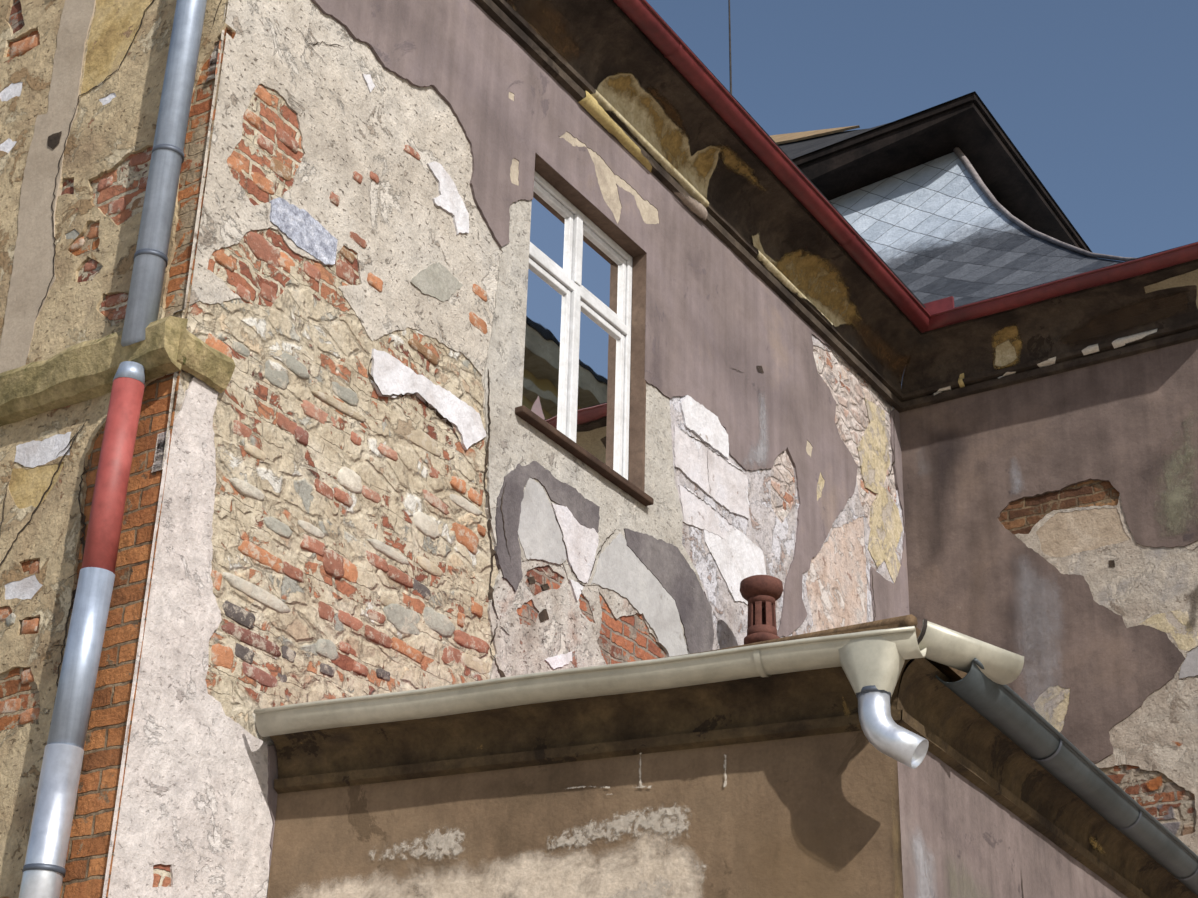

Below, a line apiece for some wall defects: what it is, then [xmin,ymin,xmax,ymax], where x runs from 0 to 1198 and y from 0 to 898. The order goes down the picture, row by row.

crack [36,0,154,317]
peeling [993,326,1022,378]
peeling [1082,329,1157,355]
flaking render [9,432,71,509]
spalling [60,0,910,898]
crack [368,358,511,673]
spalling [0,559,43,635]
crack [0,421,87,724]
spalling [0,667,40,731]
spalling [998,480,1198,856]
damp [370,829,465,859]
damp [549,805,689,849]